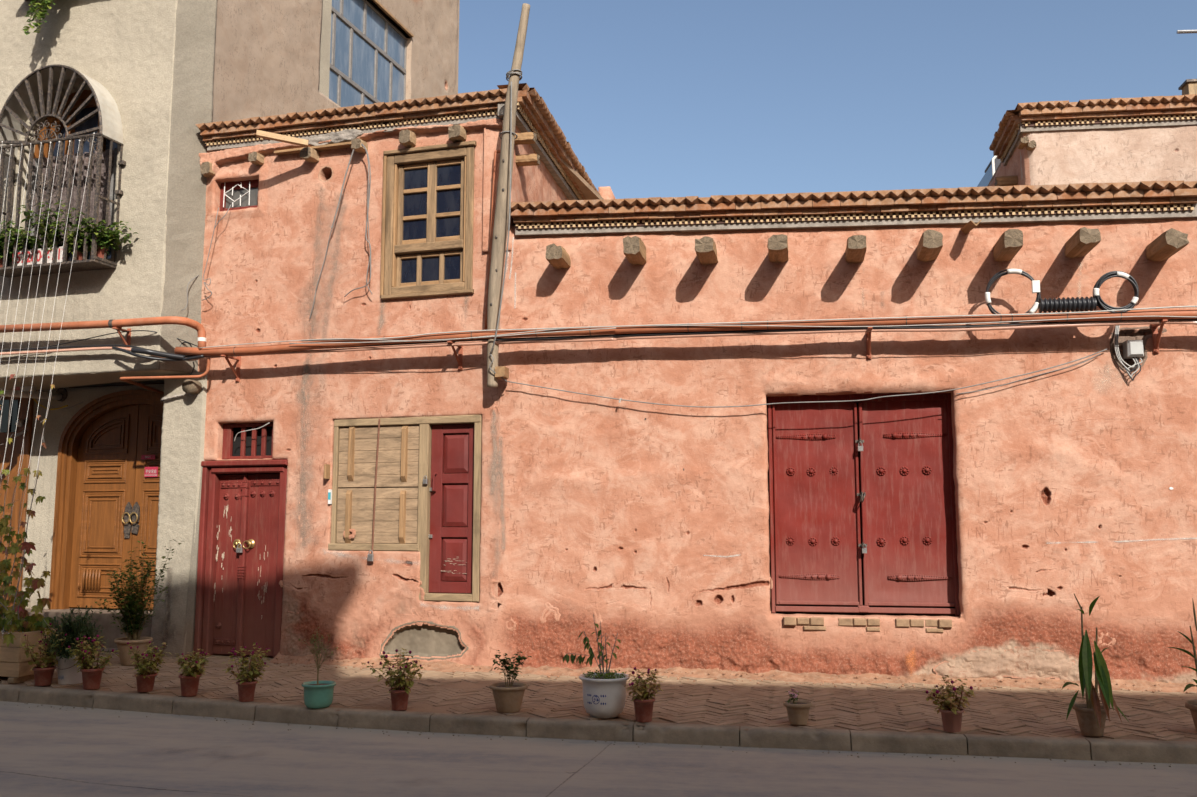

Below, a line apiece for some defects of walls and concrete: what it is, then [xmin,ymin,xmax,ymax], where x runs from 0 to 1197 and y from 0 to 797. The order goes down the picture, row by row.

crack [279,181,350,592]
crack [519,569,773,624]
flaking render [280,580,1197,683]